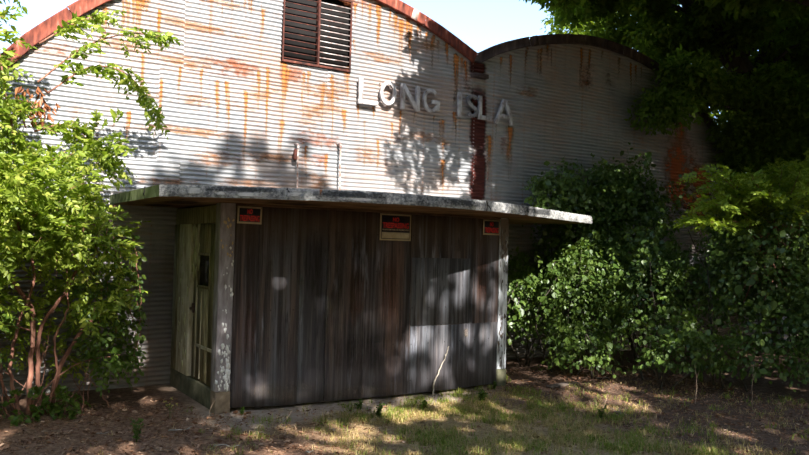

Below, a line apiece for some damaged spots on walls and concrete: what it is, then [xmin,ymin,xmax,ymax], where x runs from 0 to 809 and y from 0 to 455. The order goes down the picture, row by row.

corrosion [122,0,148,22]
corrosion [157,9,222,34]
corrosion [166,57,203,85]
corrosion [188,59,270,142]
corrosion [280,62,311,95]
corrosion [301,68,350,126]
corrosion [350,0,513,200]
corrosion [168,126,223,137]
corrosion [664,122,711,225]
peeling [215,309,231,391]